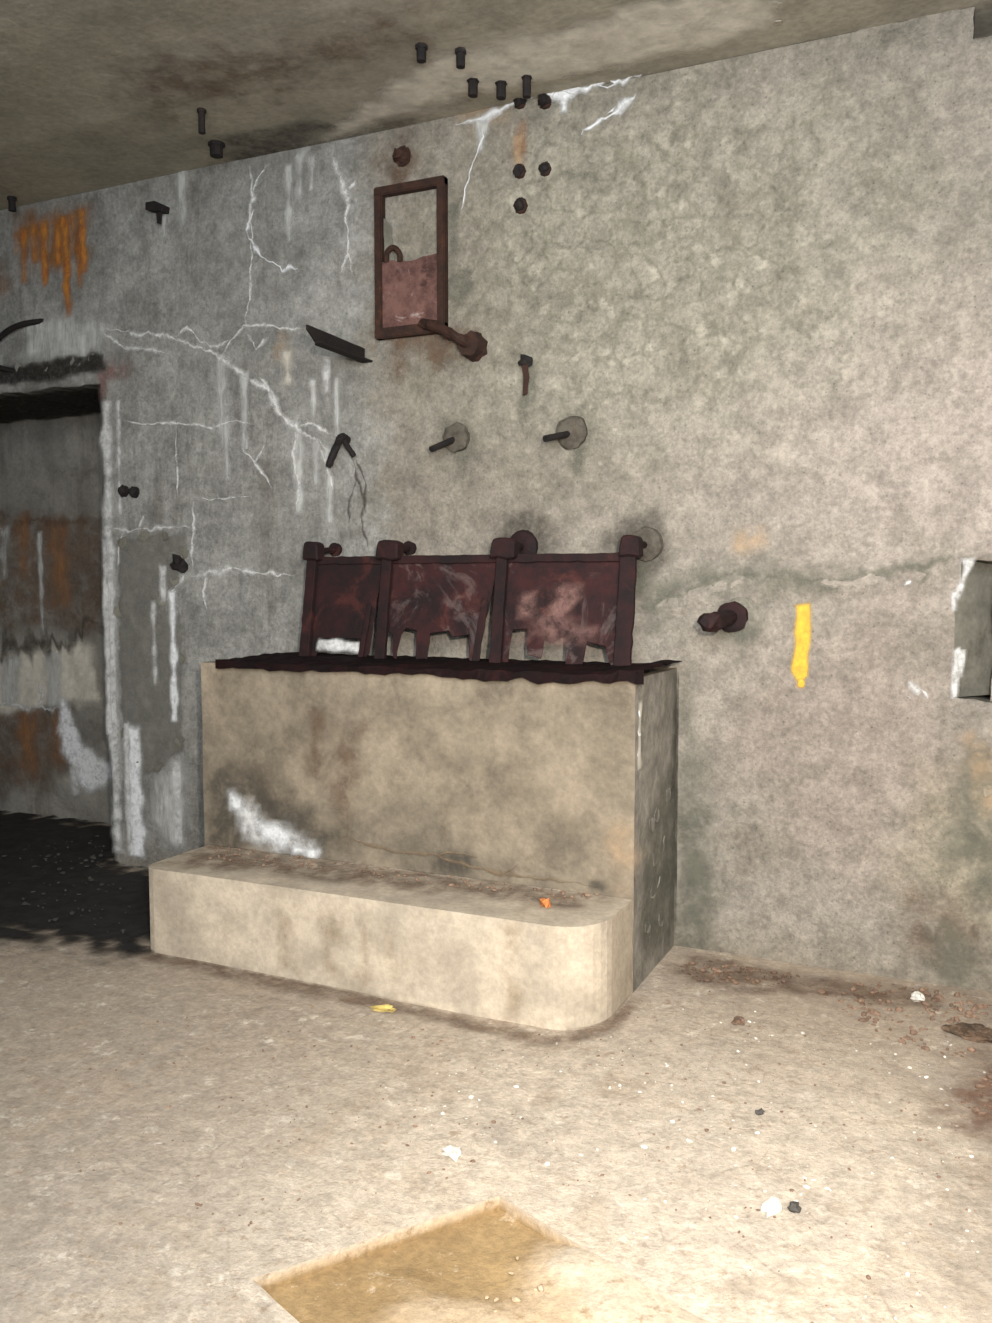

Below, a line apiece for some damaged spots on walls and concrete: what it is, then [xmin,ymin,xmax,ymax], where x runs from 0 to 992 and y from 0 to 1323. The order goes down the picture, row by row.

crack [456,102,514,205]
crack [547,76,634,130]
rust [15,209,87,312]
crack [103,160,366,606]
water stain [0,400,185,856]
water stain [212,773,325,858]